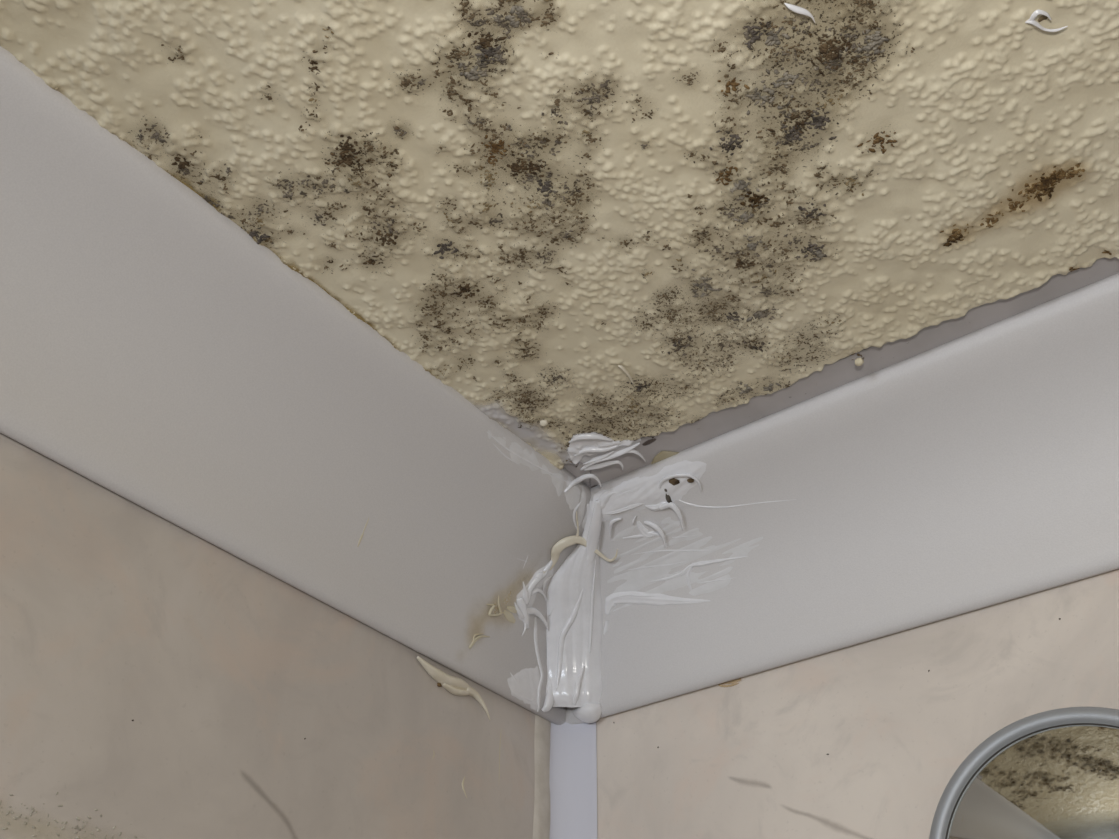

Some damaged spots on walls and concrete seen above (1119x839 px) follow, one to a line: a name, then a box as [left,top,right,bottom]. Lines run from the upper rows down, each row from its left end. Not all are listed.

leakage [128,0,915,467]
peeling [549,511,618,570]